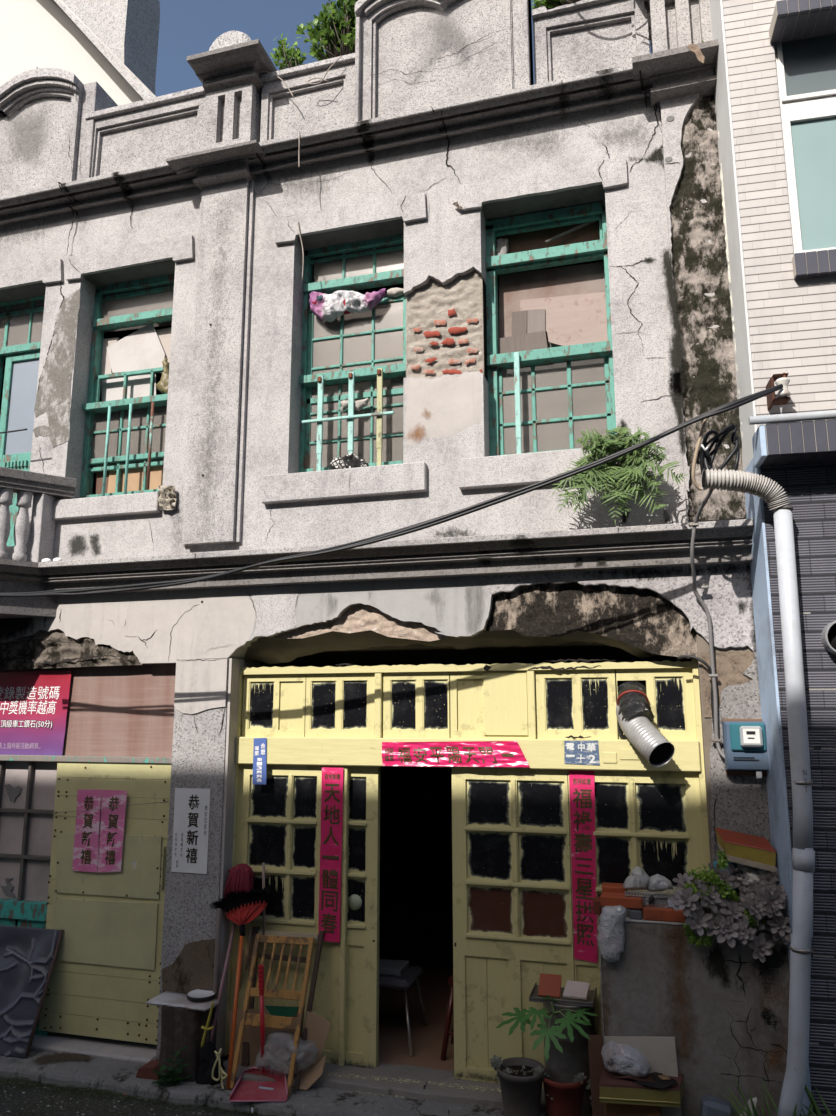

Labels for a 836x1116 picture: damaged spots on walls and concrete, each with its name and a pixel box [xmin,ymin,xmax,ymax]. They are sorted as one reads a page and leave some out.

crack [374,28,509,75]
crack [256,87,461,233]
peeling [33,288,80,448]
crack [38,139,81,390]
spalling [406,270,484,379]
crack [616,260,666,359]
leakage [89,534,101,555]
spalling [0,629,143,670]
spalling [273,604,449,641]
spalling [486,582,754,717]
leakage [703,945,746,990]
leakage [753,945,789,992]